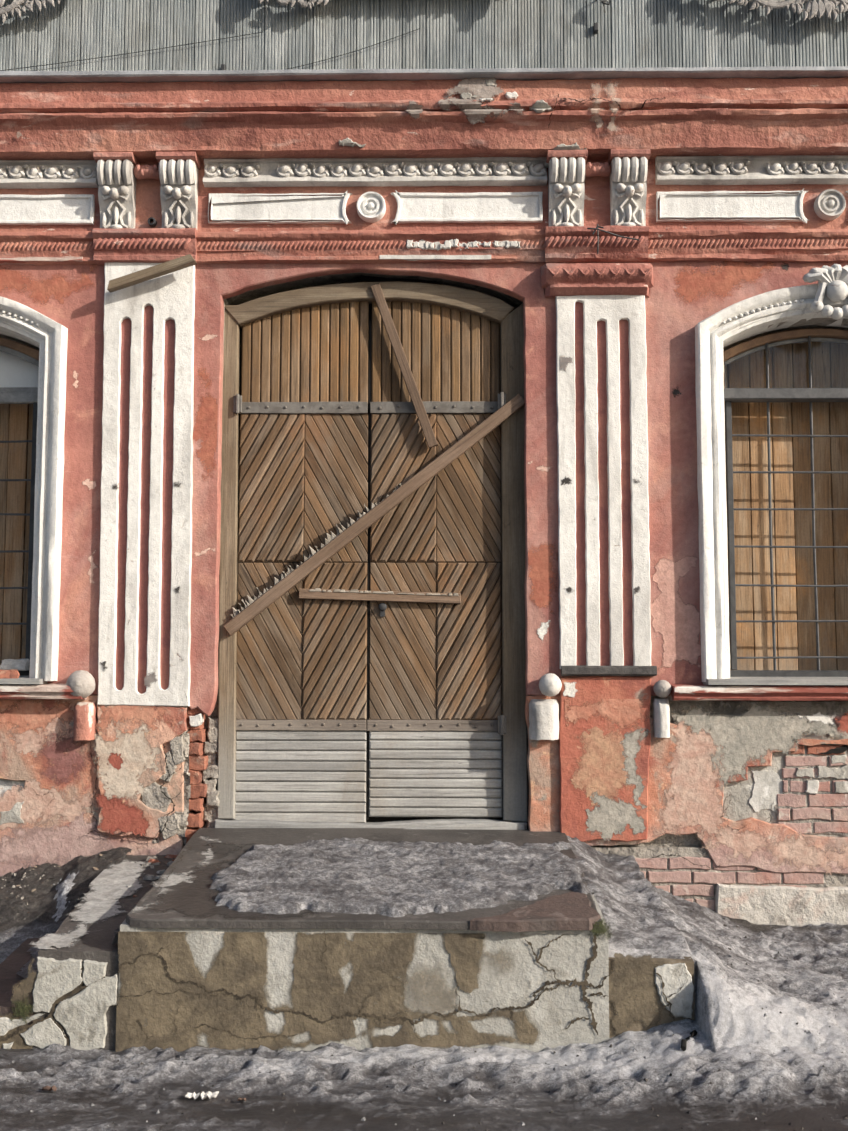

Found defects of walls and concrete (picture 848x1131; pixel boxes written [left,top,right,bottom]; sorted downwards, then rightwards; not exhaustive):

peeling [406,101,423,119]
peeling [438,78,524,124]
peeling [380,239,521,261]
peeling [0,699,191,846]
flaking render [563,682,848,876]
crack [0,931,610,1045]